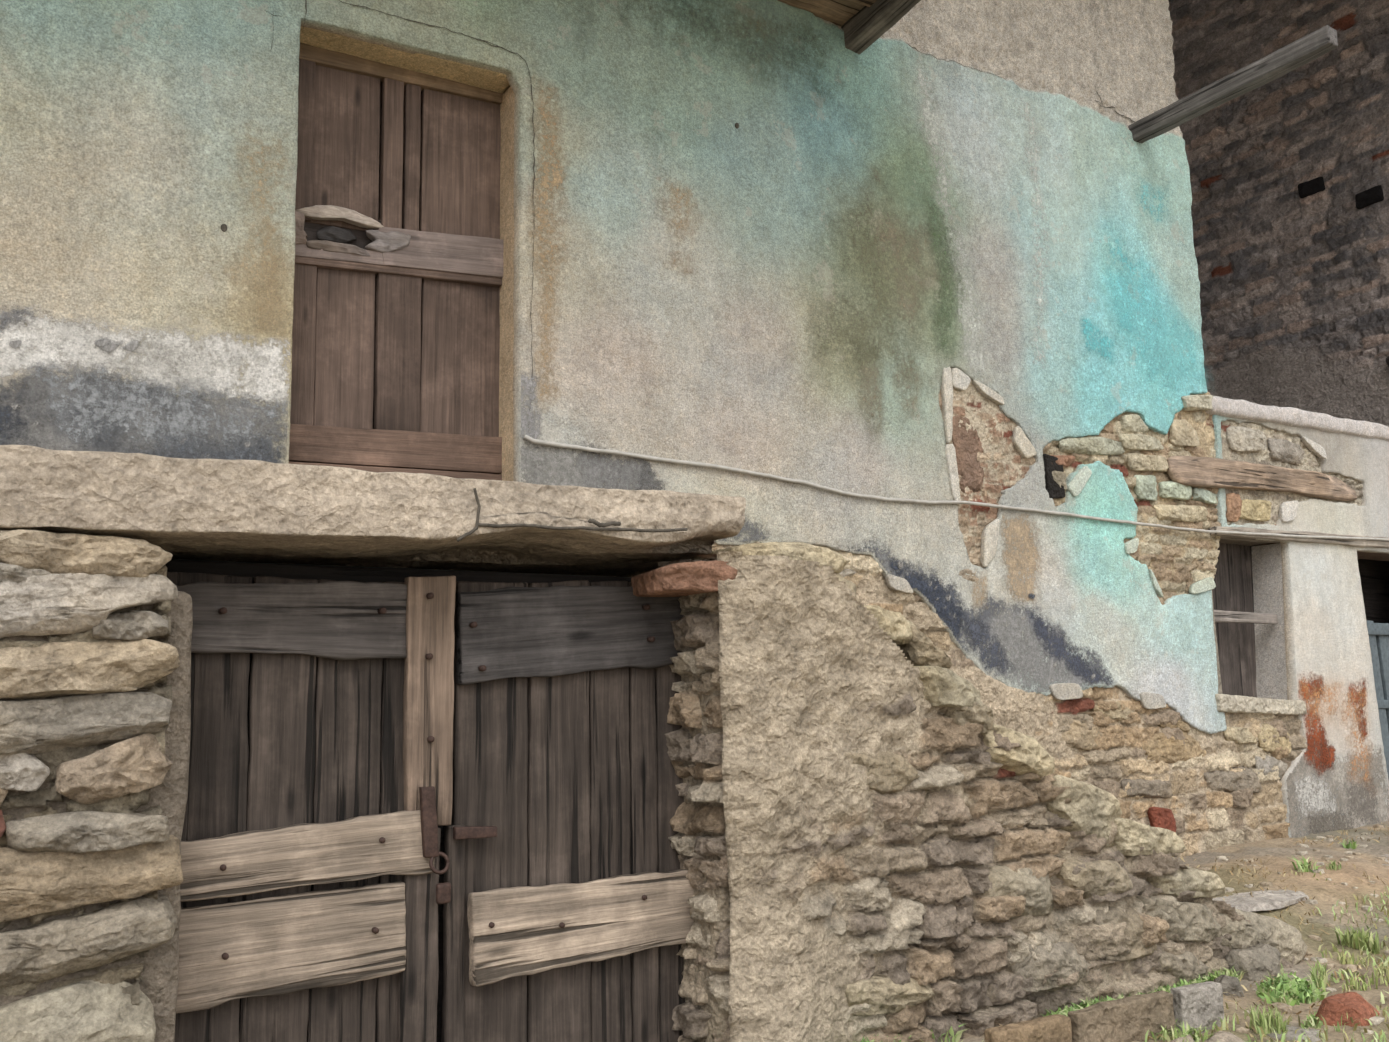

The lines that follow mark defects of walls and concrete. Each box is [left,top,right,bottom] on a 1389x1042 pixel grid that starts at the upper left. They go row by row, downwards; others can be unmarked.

damp [820,69,984,432]
damp [0,308,34,336]
peeling [0,311,290,405]
flaking render [938,367,1363,605]
damp [1002,514,1039,602]
flaking render [814,545,1389,857]
corrosion [1298,677,1368,781]